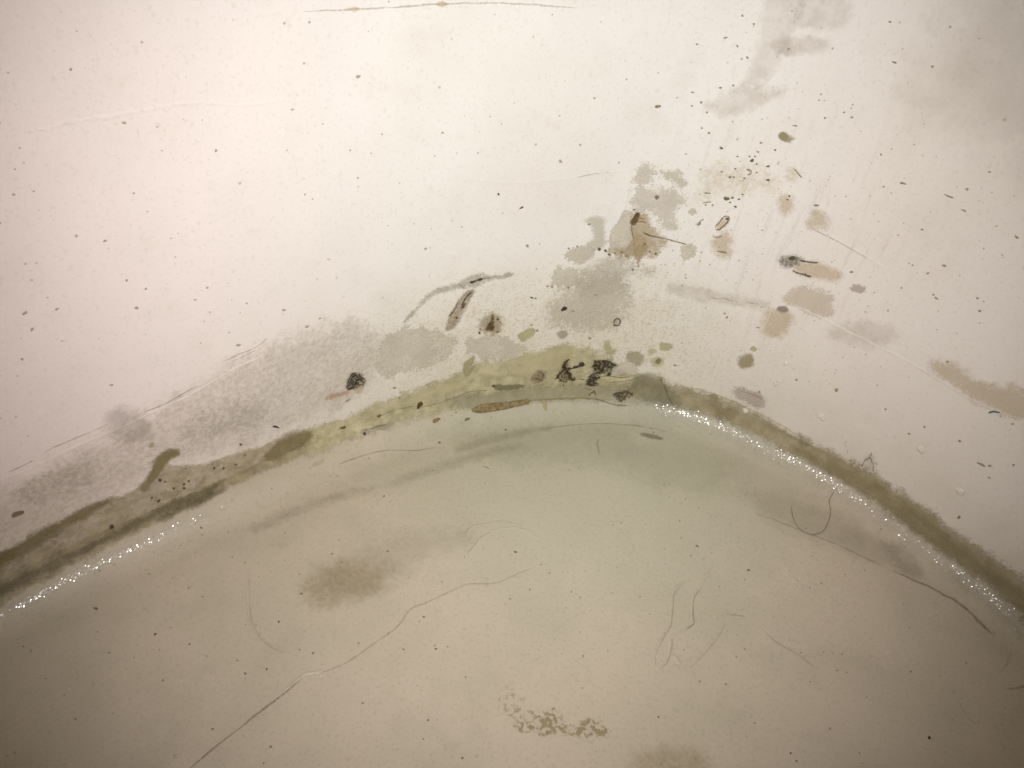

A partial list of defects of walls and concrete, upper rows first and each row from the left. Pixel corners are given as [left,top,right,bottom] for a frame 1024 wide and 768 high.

water stain [631,165,704,230]
water stain [681,244,696,260]
water stain [549,245,633,332]
water stain [777,256,833,316]
water stain [375,273,528,379]
water stain [330,373,365,399]
water stain [454,359,663,407]
water stain [739,346,757,368]
water stain [0,504,102,565]